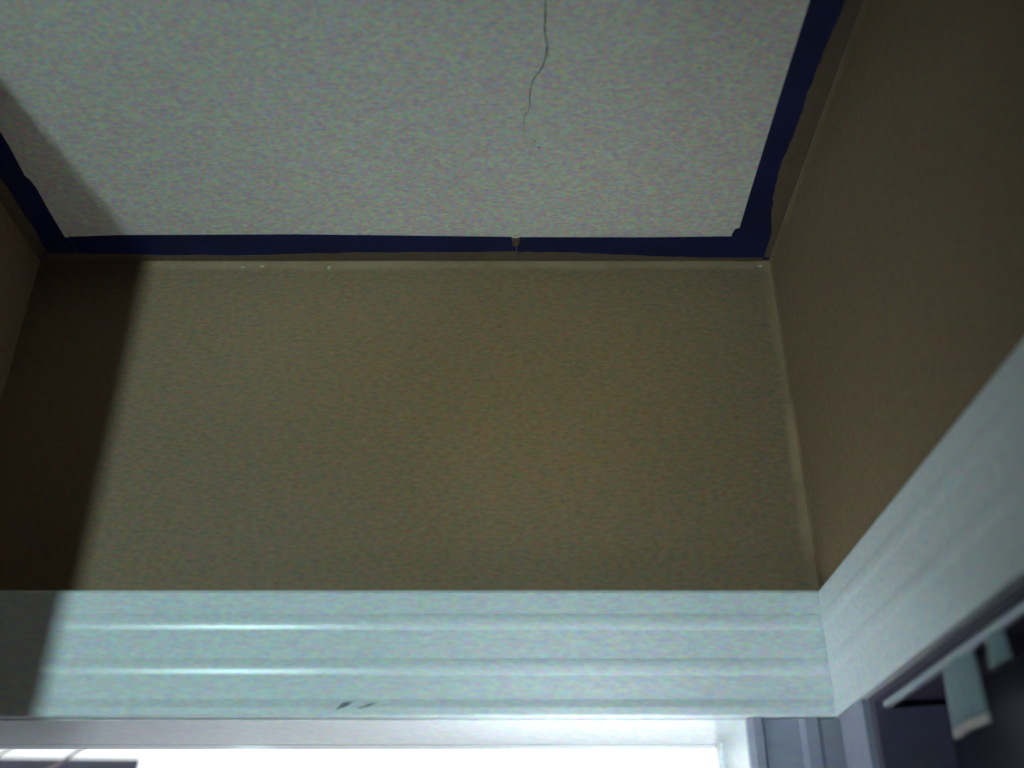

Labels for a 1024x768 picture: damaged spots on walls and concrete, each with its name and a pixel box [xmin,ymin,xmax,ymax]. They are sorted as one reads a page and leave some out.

crack [529,0,548,103]